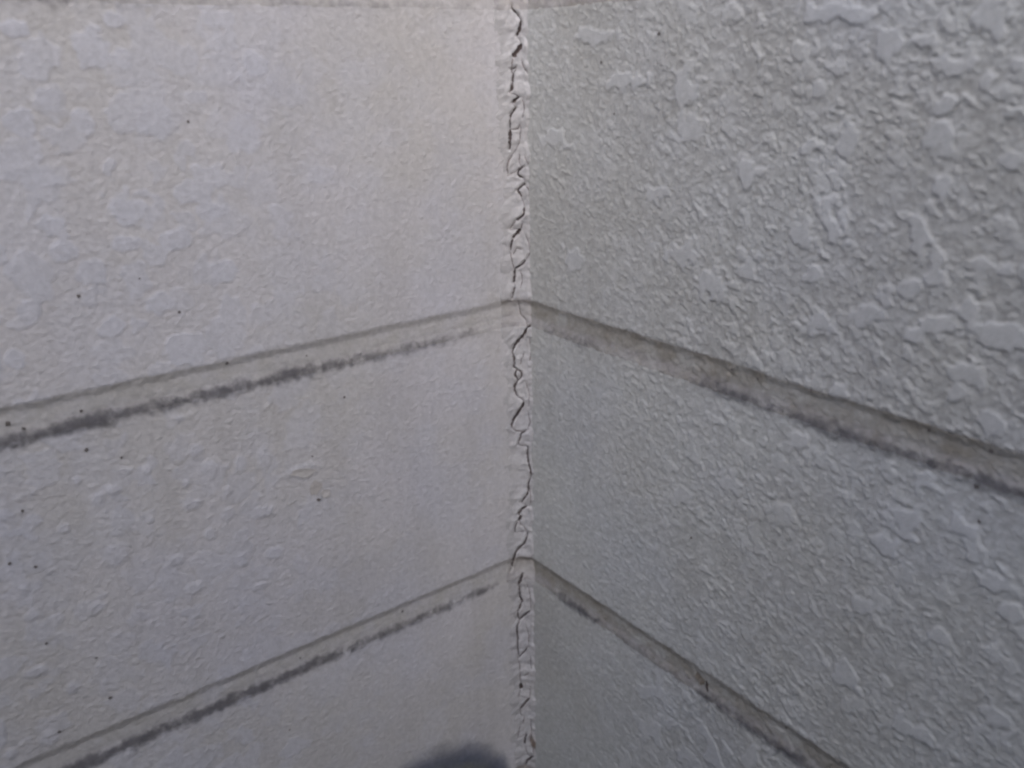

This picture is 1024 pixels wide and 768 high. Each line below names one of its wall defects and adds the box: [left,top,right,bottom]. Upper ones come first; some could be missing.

crack [506,6,534,764]